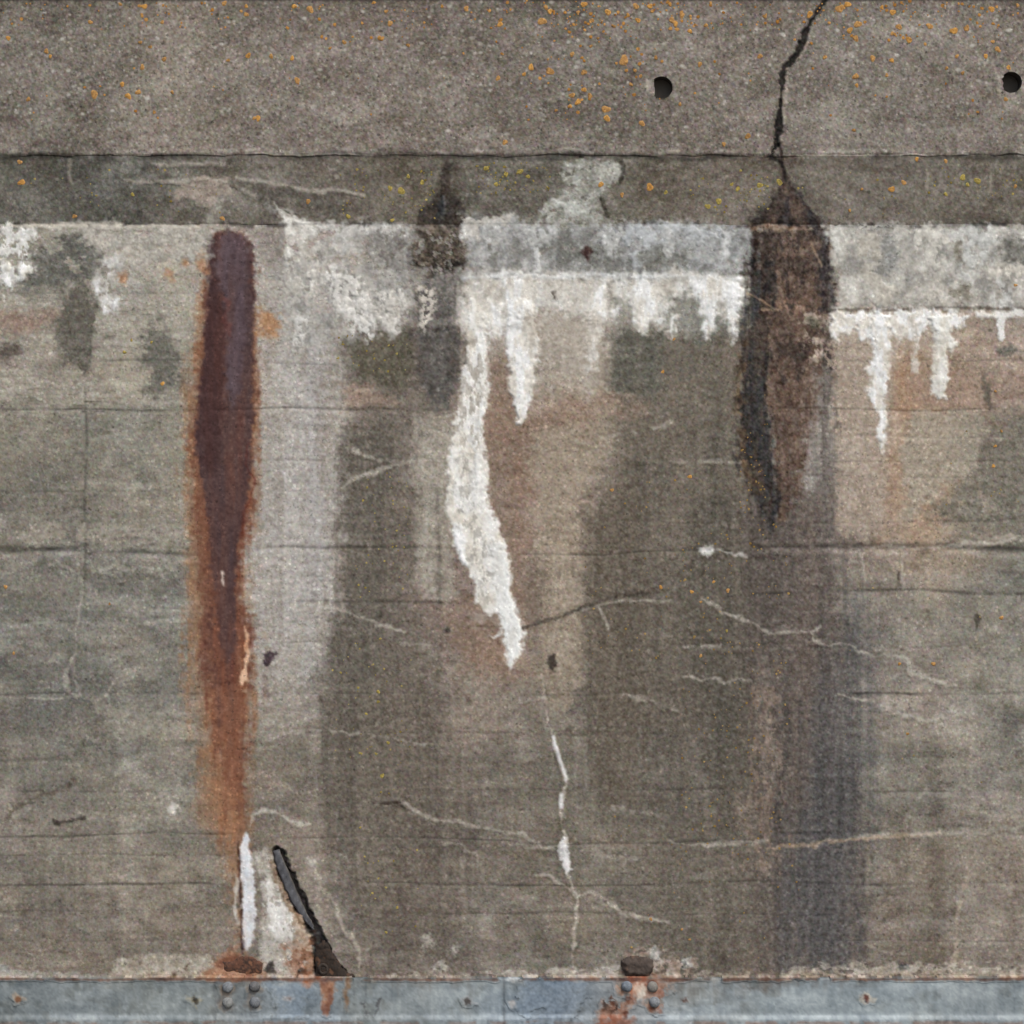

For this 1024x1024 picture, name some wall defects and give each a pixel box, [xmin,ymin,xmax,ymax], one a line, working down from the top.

crack [768,0,830,183]
damp [0,215,220,376]
rust [0,226,501,1024]
crack [260,728,437,749]
crack [288,601,434,649]
damp [251,158,1024,978]
crack [363,668,924,968]
crack [699,595,959,750]
spalling [252,844,347,977]
rust [562,969,1024,1024]